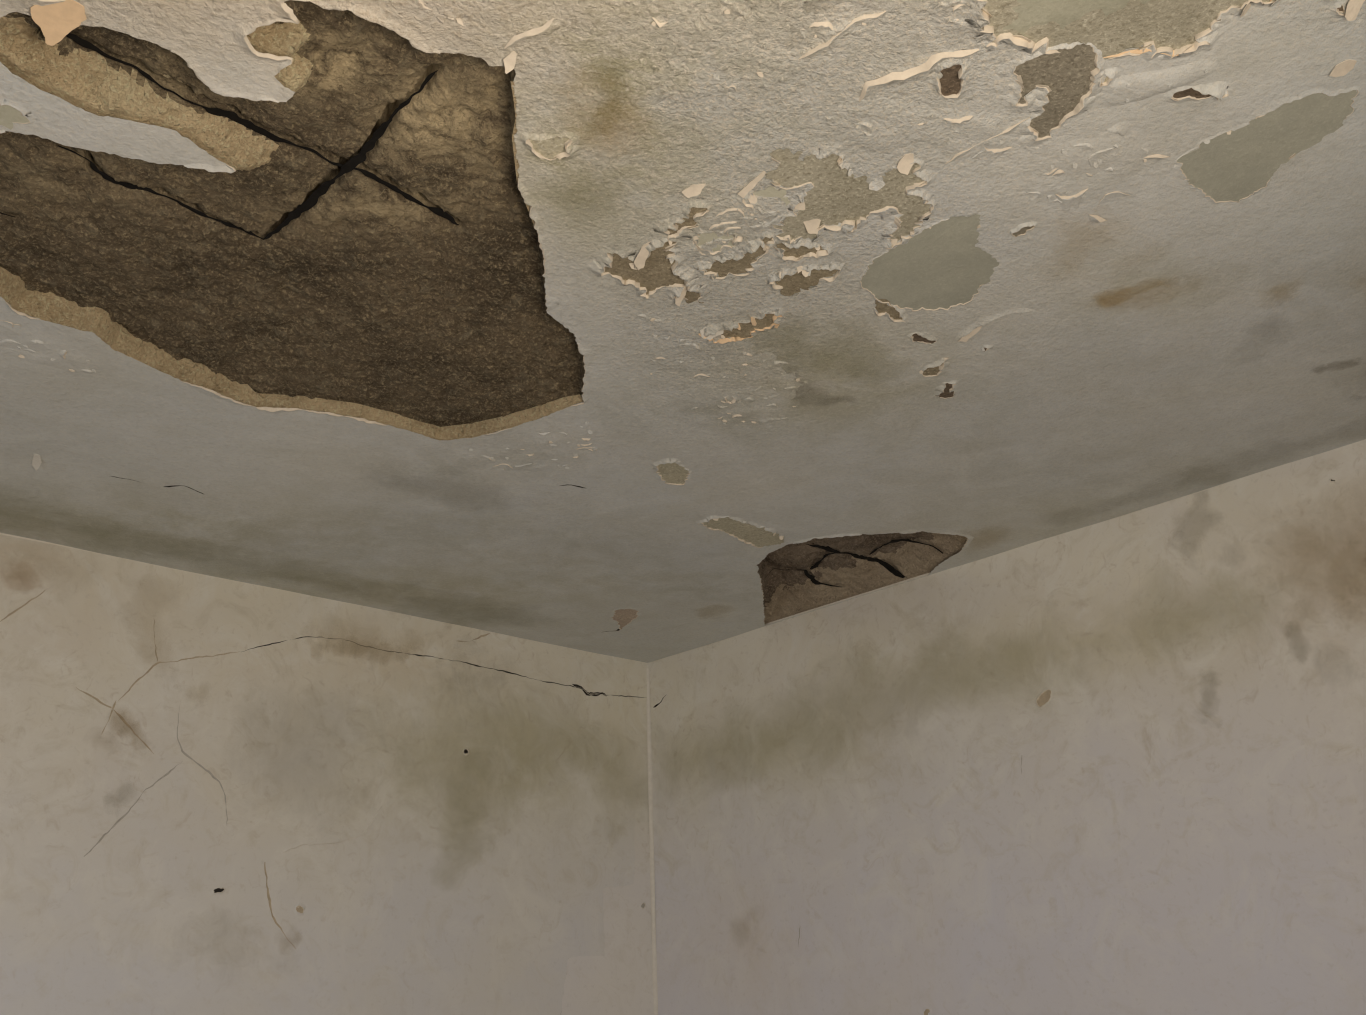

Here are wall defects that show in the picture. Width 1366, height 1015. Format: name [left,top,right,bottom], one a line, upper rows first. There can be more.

peeling [930,0,1283,147]
peeling [1173,59,1362,204]
spalling [0,0,596,440]
peeling [586,141,999,399]
crack [0,590,46,622]
spalling [695,515,976,624]
crack [76,618,666,857]